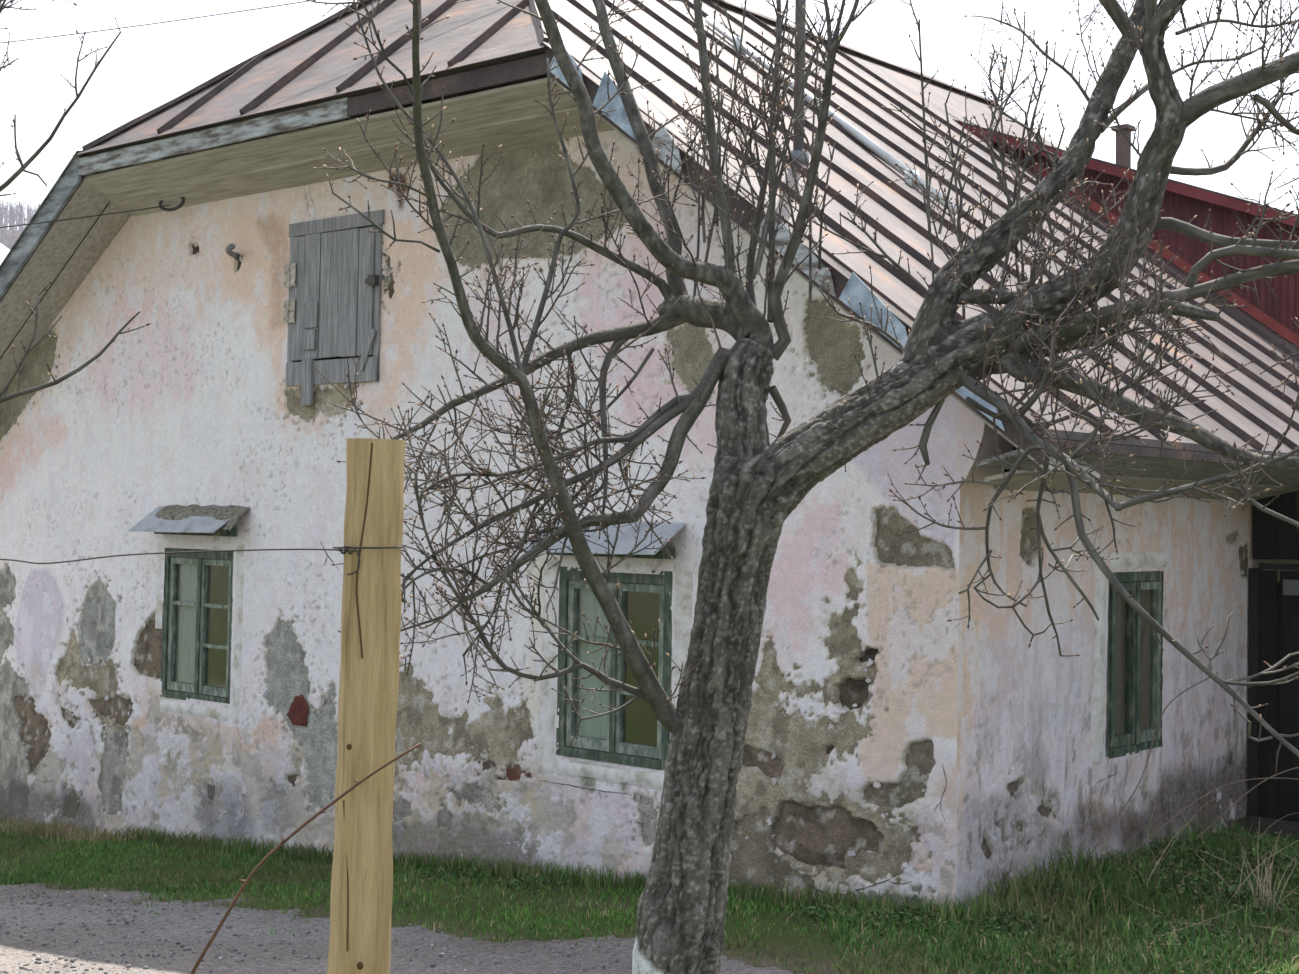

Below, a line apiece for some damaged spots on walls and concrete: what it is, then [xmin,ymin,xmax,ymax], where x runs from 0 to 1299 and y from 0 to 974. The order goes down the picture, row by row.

flaking render [441,139,628,276]
flaking render [666,323,715,401]
flaking render [804,299,865,397]
flaking render [0,563,162,823]
flaking render [263,619,338,820]
peeling [393,661,537,832]
flaking render [734,507,955,909]